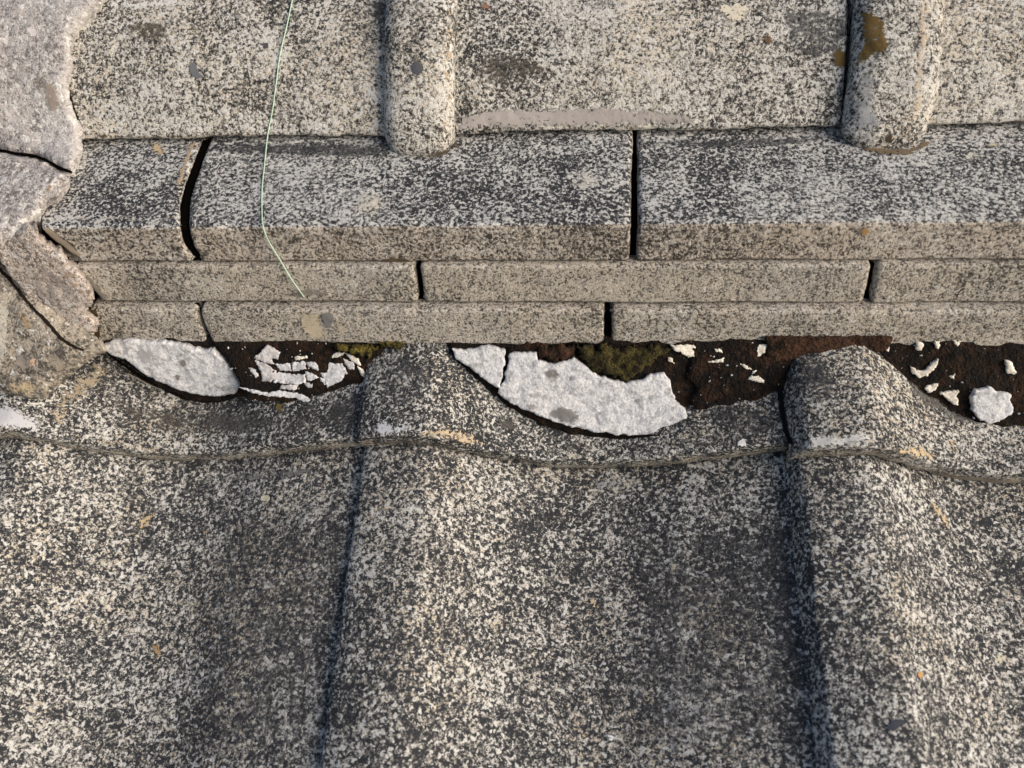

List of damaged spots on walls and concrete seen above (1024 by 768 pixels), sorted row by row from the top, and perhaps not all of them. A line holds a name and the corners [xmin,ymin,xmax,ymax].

crack [0,149,72,174]
crack [180,140,210,261]
peeling [668,344,696,364]
peeling [239,344,365,402]
peeling [741,364,765,383]
peeling [910,340,961,405]
peeling [1004,360,1017,374]